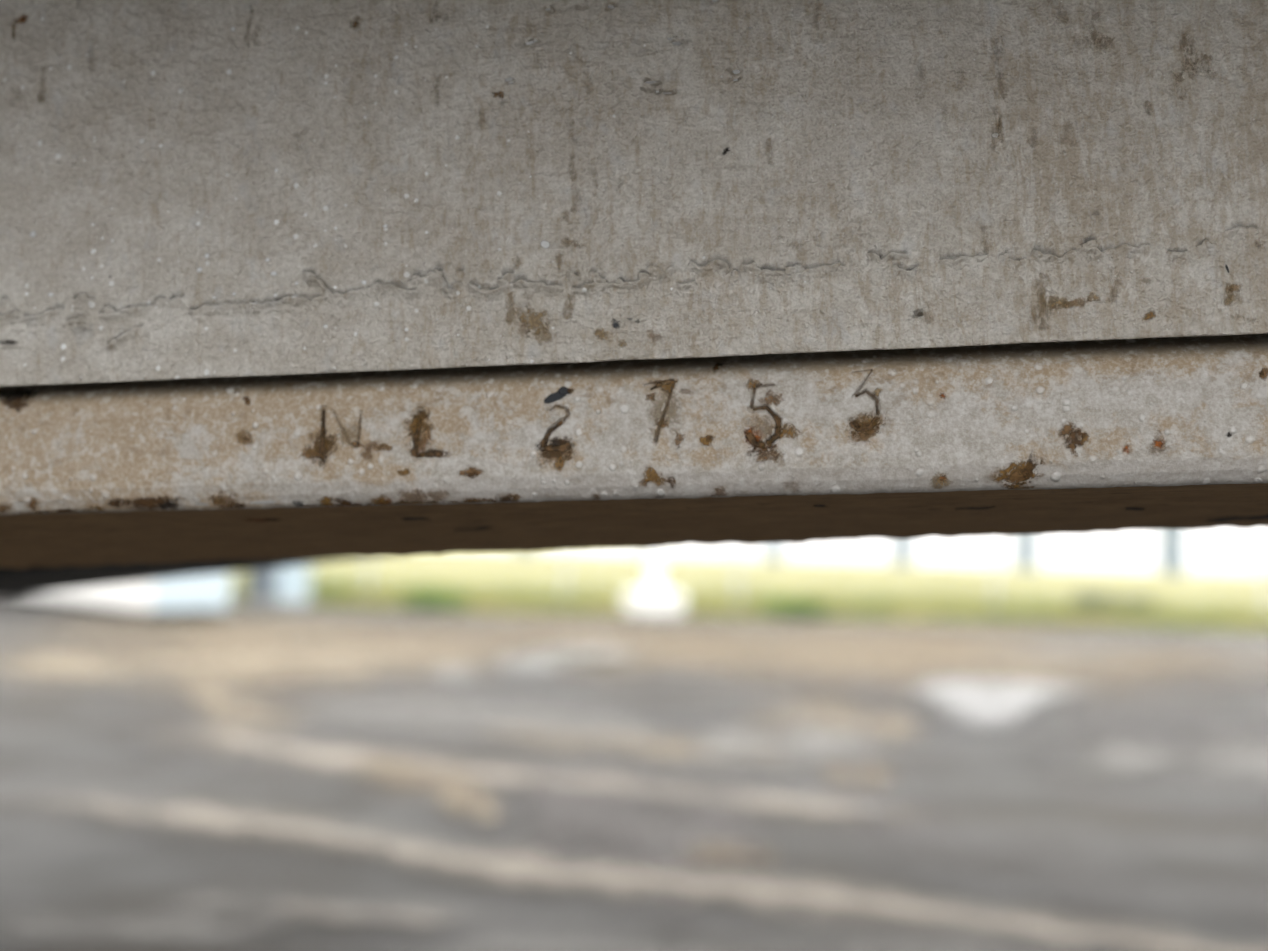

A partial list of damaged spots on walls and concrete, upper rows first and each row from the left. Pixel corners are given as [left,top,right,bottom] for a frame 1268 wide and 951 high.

crack [1028,212,1221,270]
crack [0,250,928,356]
rust [1059,423,1089,456]
rust [993,455,1044,489]